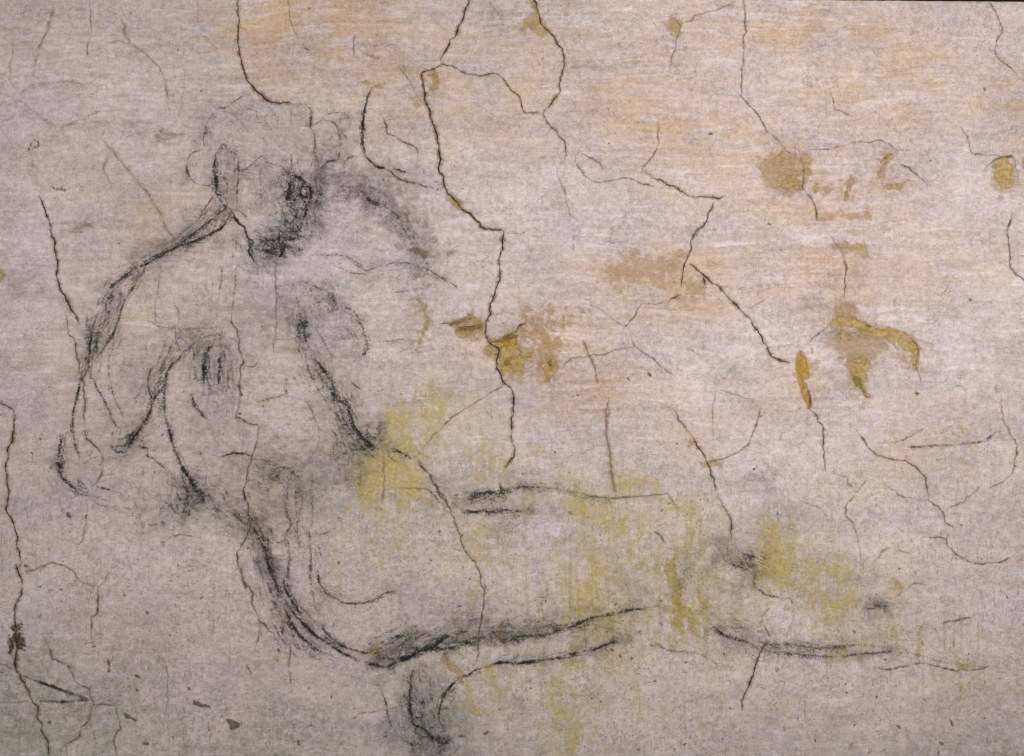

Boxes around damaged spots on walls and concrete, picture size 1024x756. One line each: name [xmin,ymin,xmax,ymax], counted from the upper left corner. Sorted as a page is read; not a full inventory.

crack [236,1,290,105]
spalling [993,156,1024,197]
crack [384,0,601,467]
crack [638,135,789,363]
crack [40,198,103,483]
spalling [449,314,525,373]
spalling [539,358,560,383]
spalling [794,349,813,409]
spalling [847,353,871,398]
spalling [830,304,922,369]
crack [230,321,271,632]
crack [0,403,121,754]